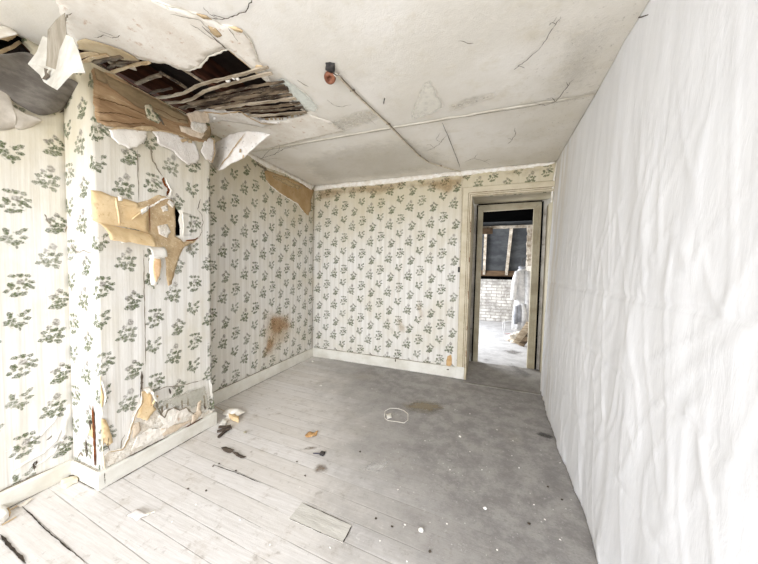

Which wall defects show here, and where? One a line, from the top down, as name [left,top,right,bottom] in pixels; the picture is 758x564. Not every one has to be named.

spalling [0,34,30,54]
crack [172,0,252,49]
peeling [109,110,215,165]
crack [261,80,587,167]
spalling [101,387,213,481]